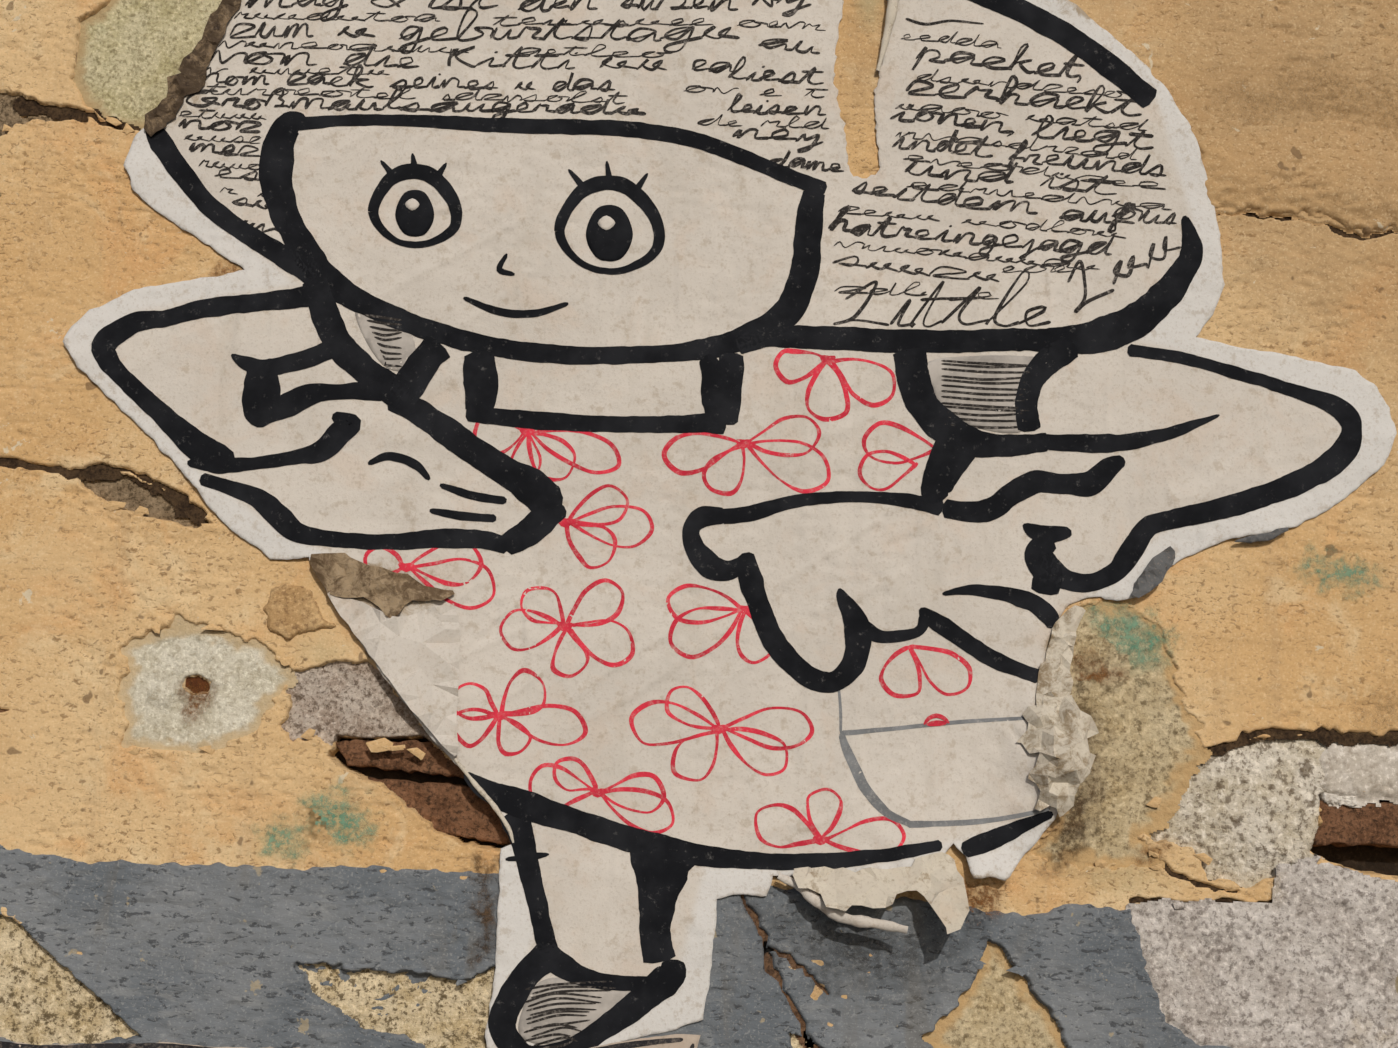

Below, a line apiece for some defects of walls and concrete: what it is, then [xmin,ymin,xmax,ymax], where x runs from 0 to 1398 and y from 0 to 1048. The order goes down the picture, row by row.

crack [13,96,141,131]
flaking render [73,0,222,134]
crack [0,457,208,526]
peeling [117,584,511,848]
flaking render [1031,599,1398,1048]
flaking render [0,915,139,1045]
flaking render [298,963,496,1048]
crack [741,894,829,1048]
flaking render [922,941,1066,1048]